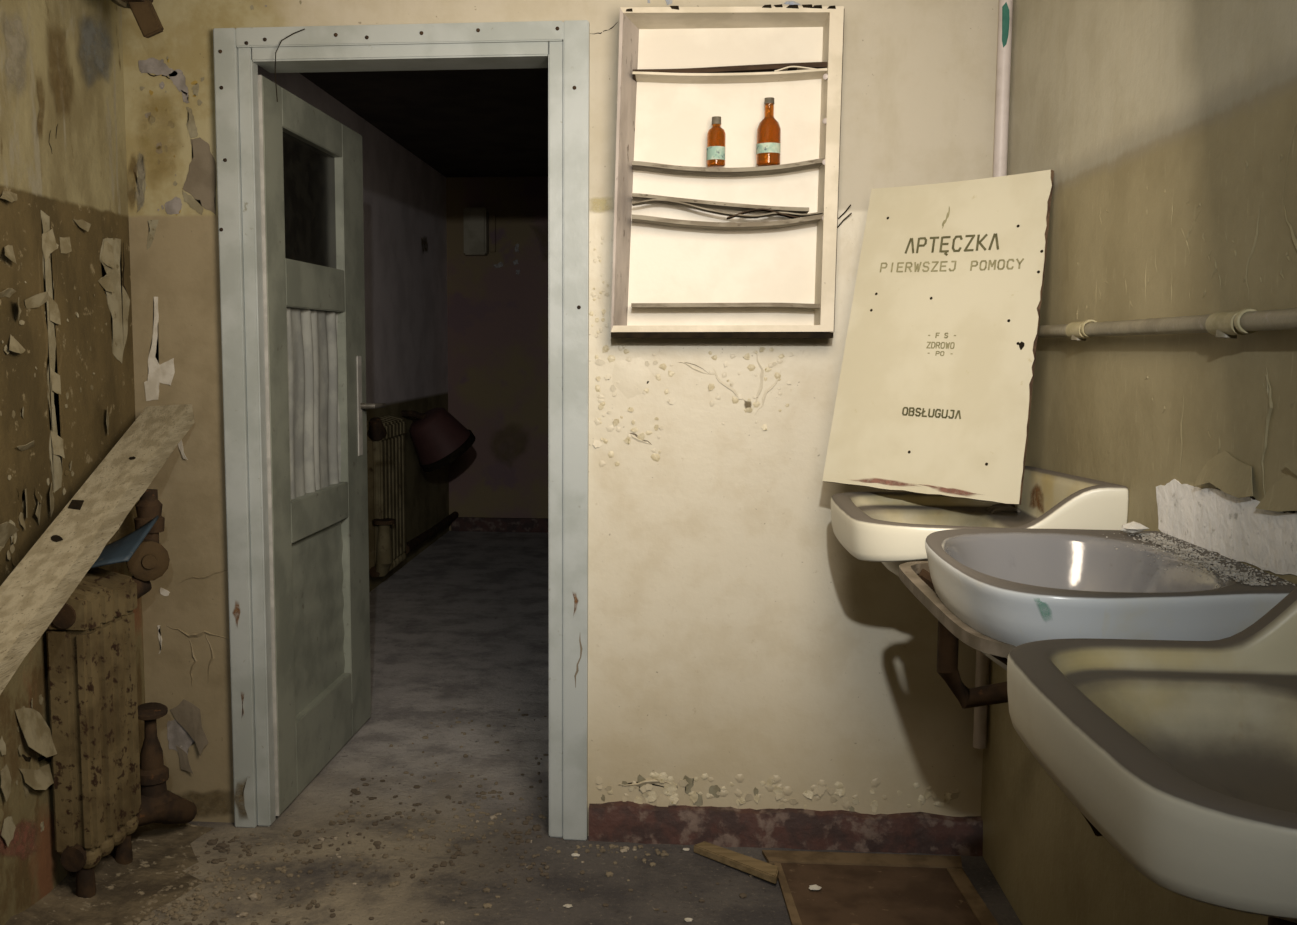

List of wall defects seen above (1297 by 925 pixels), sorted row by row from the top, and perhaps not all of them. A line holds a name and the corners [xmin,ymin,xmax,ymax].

flaking render [134,56,217,250]
peeling [0,210,130,568]
peeling [144,297,175,401]
flaking render [1156,451,1297,576]
peeling [621,774,721,807]